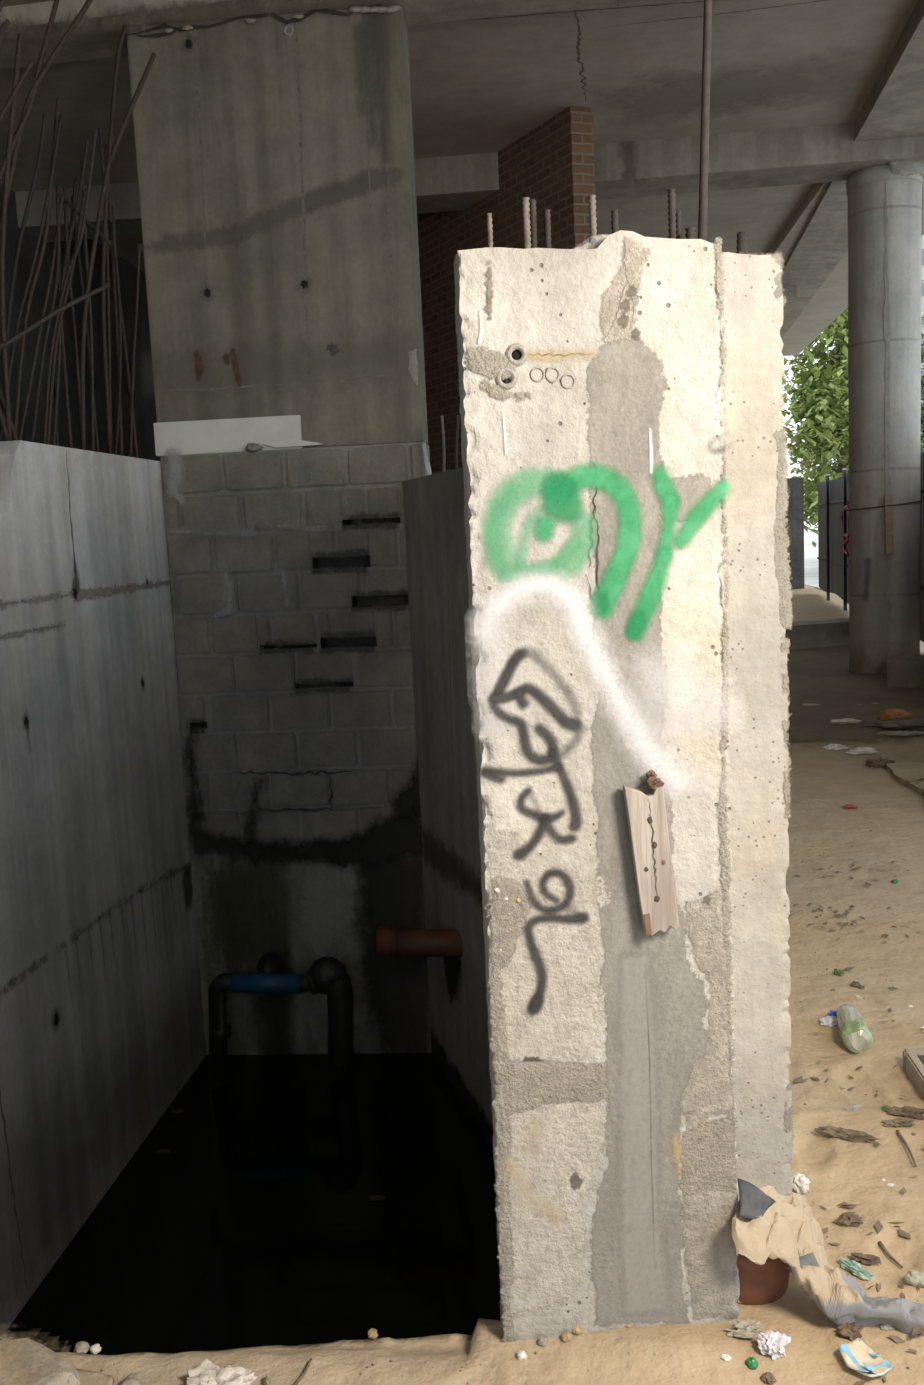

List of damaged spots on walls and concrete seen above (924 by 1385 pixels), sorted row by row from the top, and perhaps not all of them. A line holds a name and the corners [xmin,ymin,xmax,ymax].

crack [440,0,826,101]
water stain [62,719,493,1147]
peeling [484,232,747,1342]